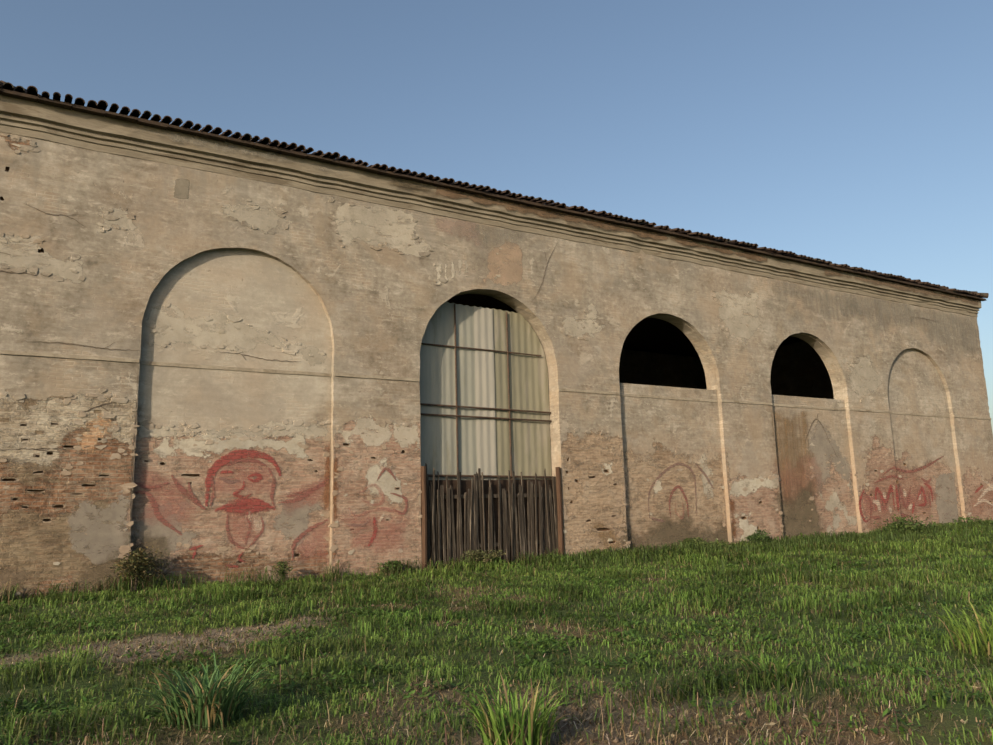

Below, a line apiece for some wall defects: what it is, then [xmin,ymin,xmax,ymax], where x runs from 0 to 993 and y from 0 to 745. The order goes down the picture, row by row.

flaking render [328,196,468,286]
flaking render [0,387,422,600]
flaking render [561,428,784,556]
water stain [772,412,821,539]
flaking render [826,434,993,533]